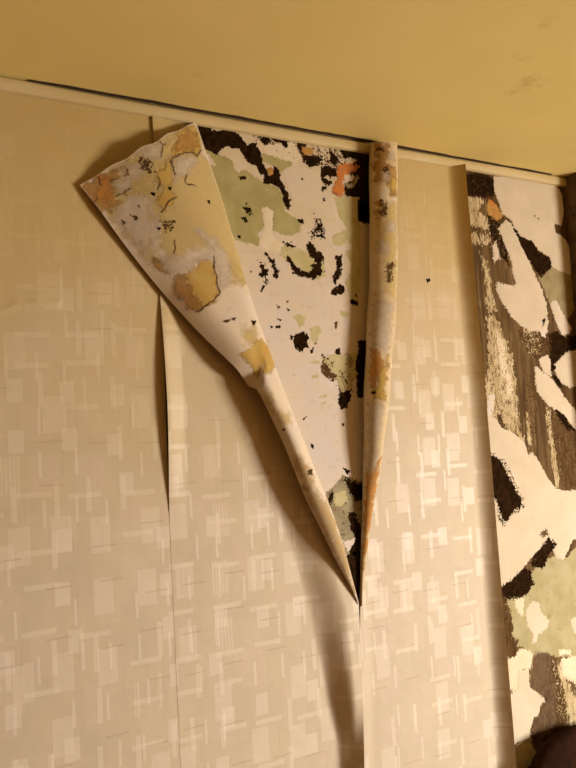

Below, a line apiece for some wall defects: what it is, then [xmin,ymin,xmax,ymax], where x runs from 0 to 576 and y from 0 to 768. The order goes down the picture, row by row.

peeling [175,157,196,178]
flaking render [493,176,574,338]
flaking render [205,132,382,556]
flaking render [534,350,576,429]
flaking render [488,416,576,768]